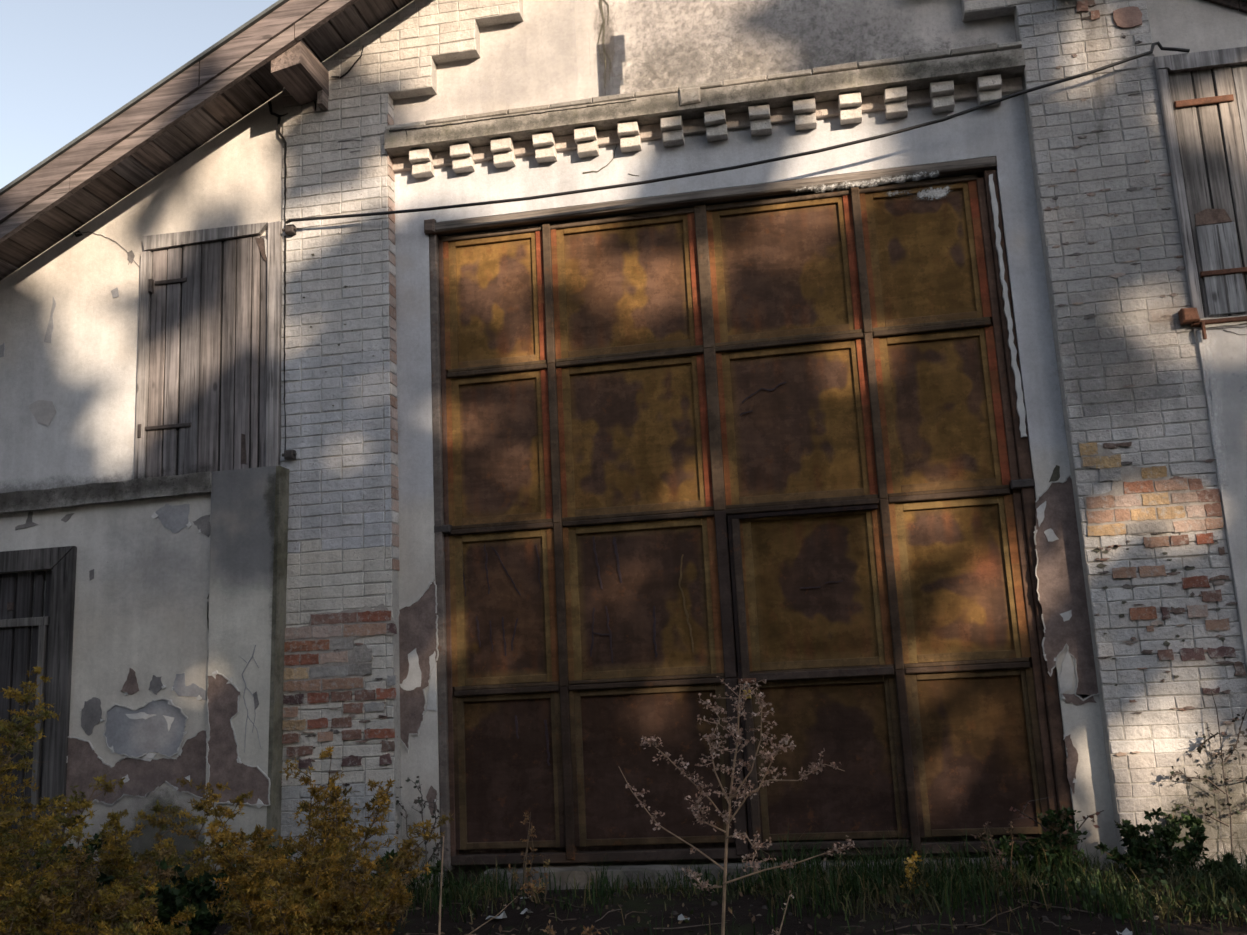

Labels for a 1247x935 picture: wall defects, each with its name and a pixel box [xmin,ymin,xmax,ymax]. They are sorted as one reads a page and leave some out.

crack [338,0,634,153]
flaking render [1076,0,1143,44]
flaking render [151,504,210,537]
flaking render [1033,442,1246,705]
flaking render [65,668,283,829]
flaking render [282,579,439,788]
flaking render [1063,734,1078,794]